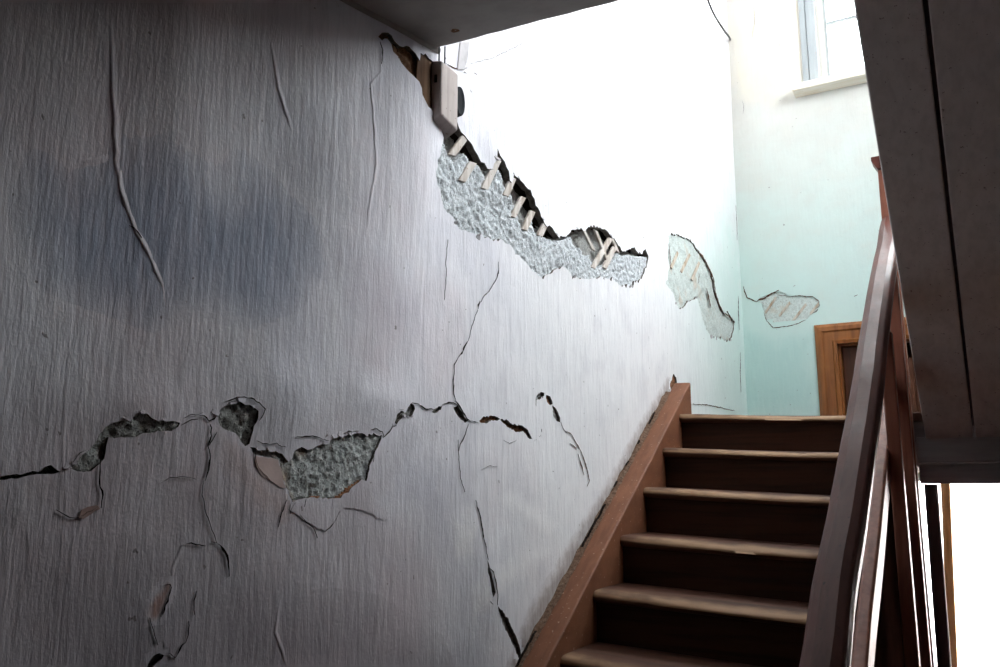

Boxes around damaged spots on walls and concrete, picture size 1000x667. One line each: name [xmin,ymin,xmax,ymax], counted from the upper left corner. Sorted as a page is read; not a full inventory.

flaking render [378,34,432,109]
flaking render [436,135,647,288]
flaking render [666,235,735,341]
flaking render [743,286,819,328]
crack [0,450,86,479]
flaking render [63,410,178,519]
crack [166,412,230,576]
flaking render [211,396,390,531]
crack [278,500,340,536]
crack [383,262,516,650]
crack [150,584,196,658]